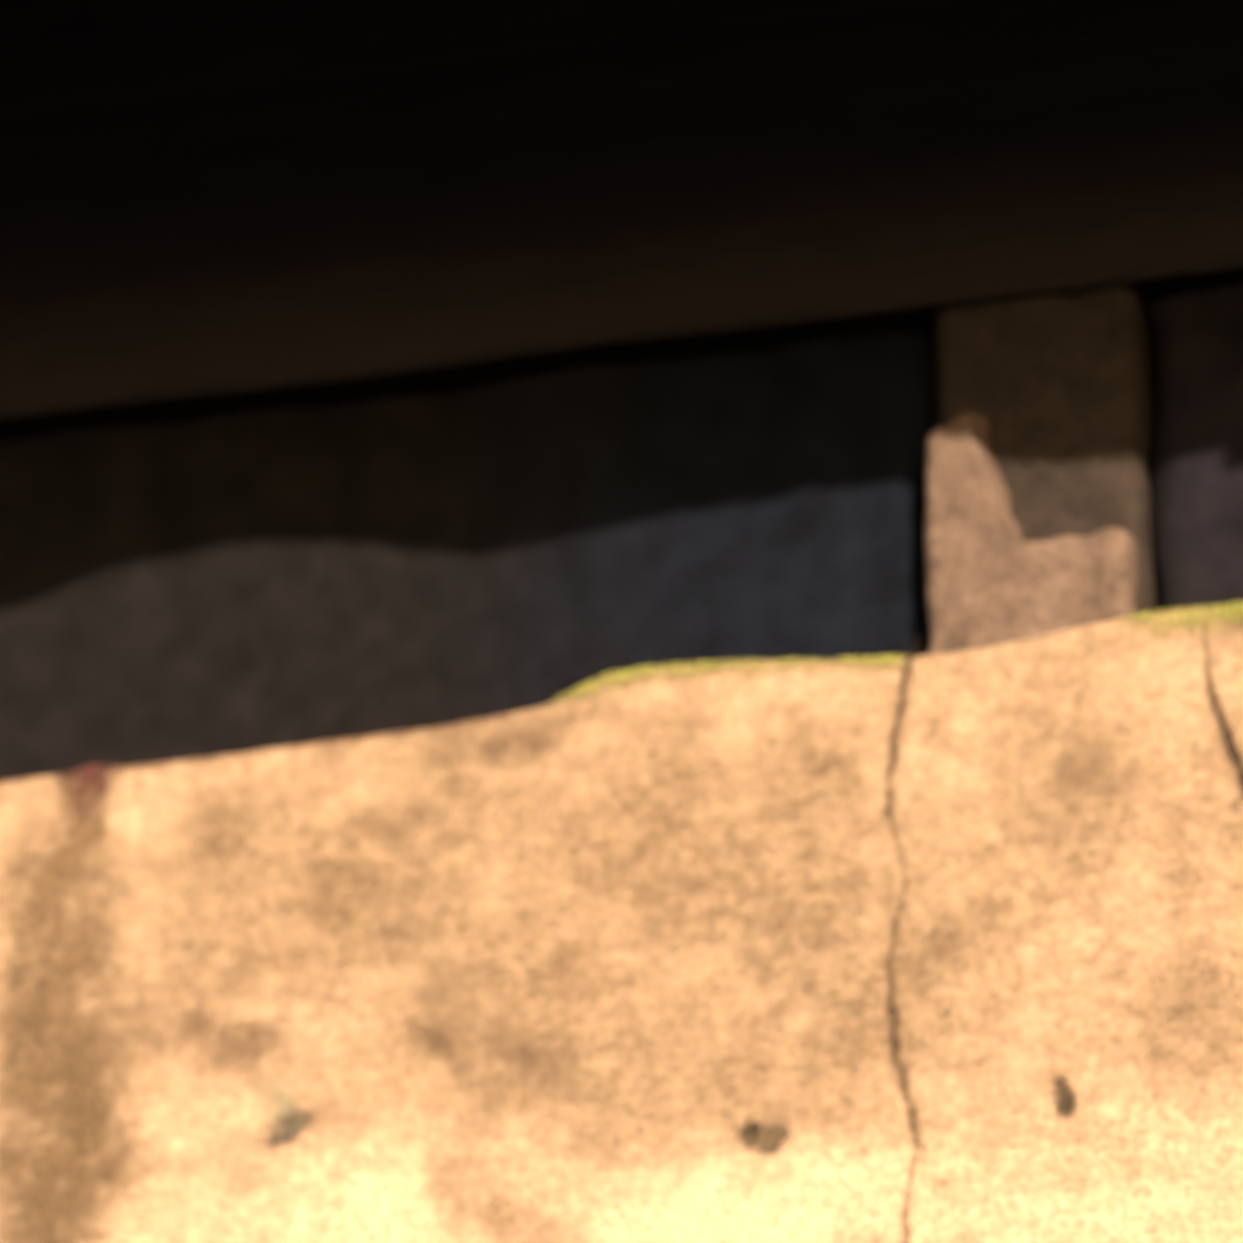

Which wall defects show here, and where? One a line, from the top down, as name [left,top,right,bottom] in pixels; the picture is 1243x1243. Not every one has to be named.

crack [887,640,918,841]
crack [1205,644,1243,784]
damp [0,765,123,1243]
crack [888,881,920,1243]